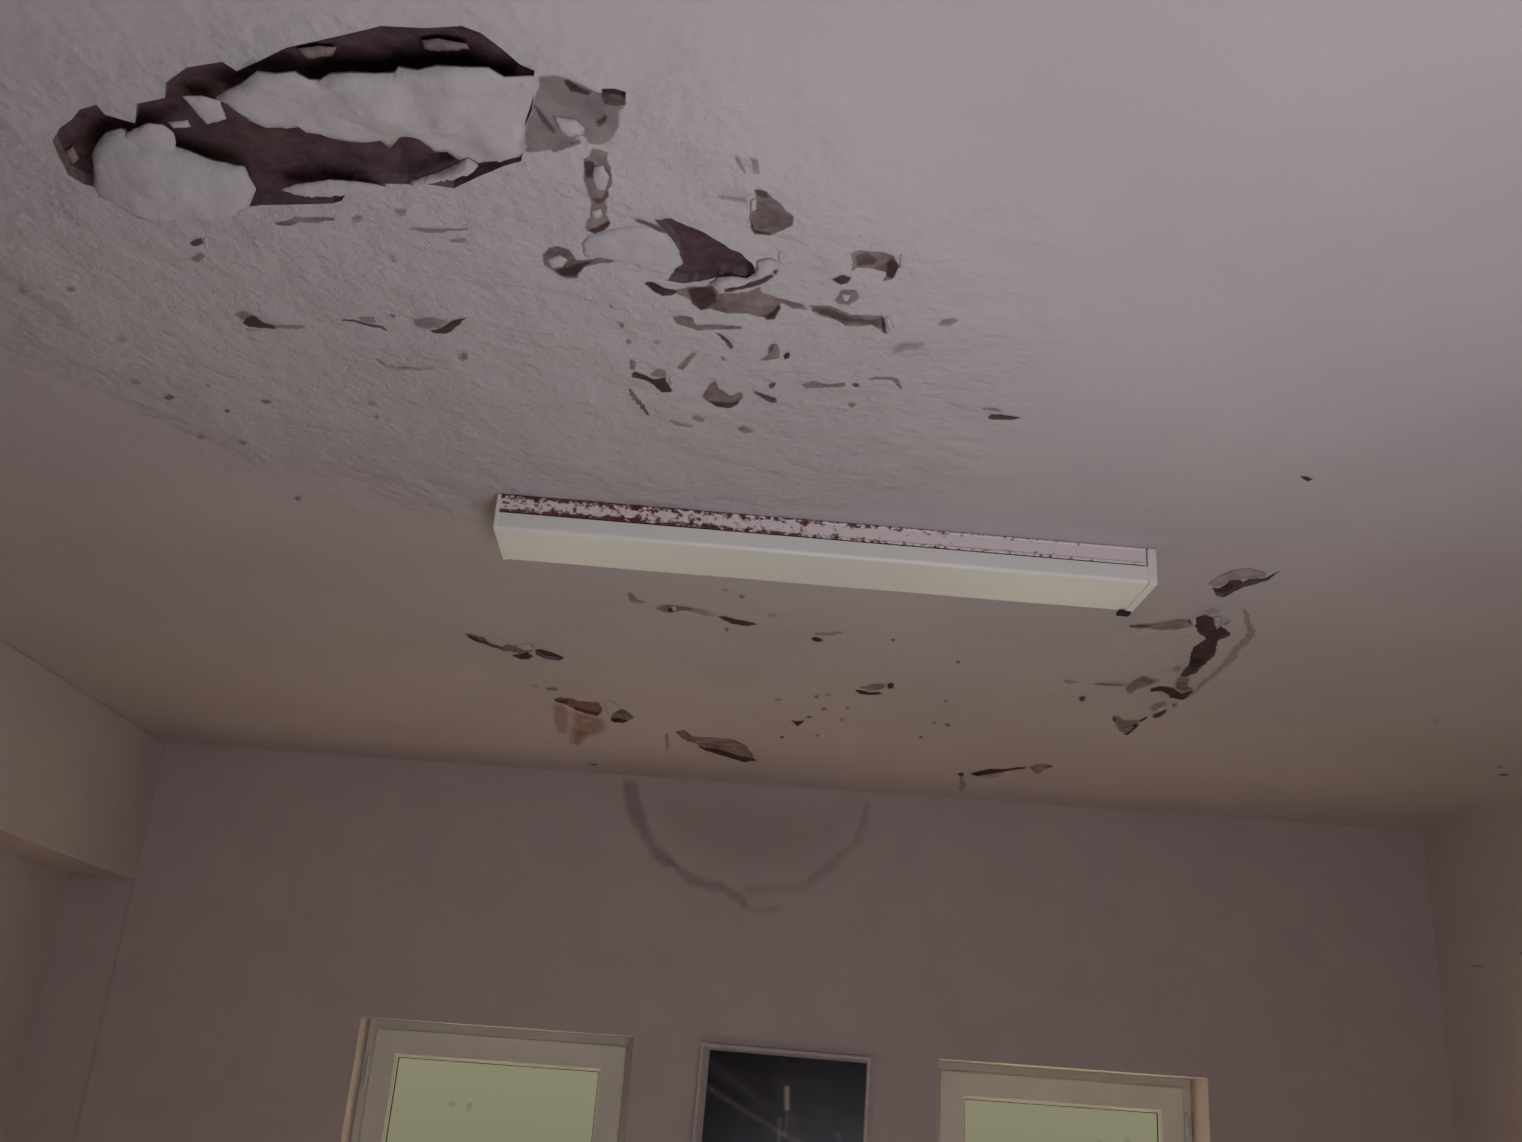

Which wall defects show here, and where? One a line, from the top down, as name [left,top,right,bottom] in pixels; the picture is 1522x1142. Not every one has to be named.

flaking render [52,26,535,249]
flaking render [543,81,904,349]
flaking render [243,316,275,336]
flaking render [432,318,466,334]
peeling [632,353,696,392]
peeling [703,381,777,408]
flaking render [1209,568,1280,597]
peeling [718,616,756,632]
peeling [463,633,564,661]
flaking render [1079,614,1230,735]
peeling [555,697,633,723]
peeling [677,730,757,762]